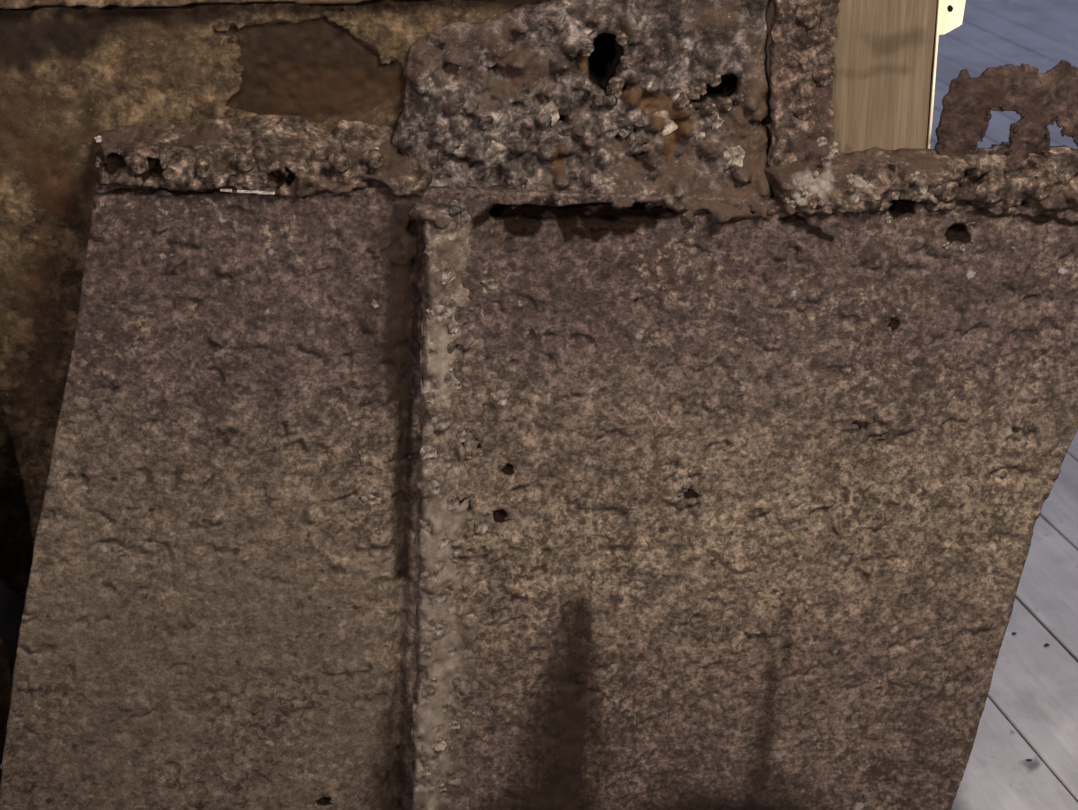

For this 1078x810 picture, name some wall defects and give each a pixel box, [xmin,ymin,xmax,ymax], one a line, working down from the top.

spalling [213,0,838,229]
rust [622,84,692,159]
peeling [847,173,873,196]
damp [523,598,597,810]